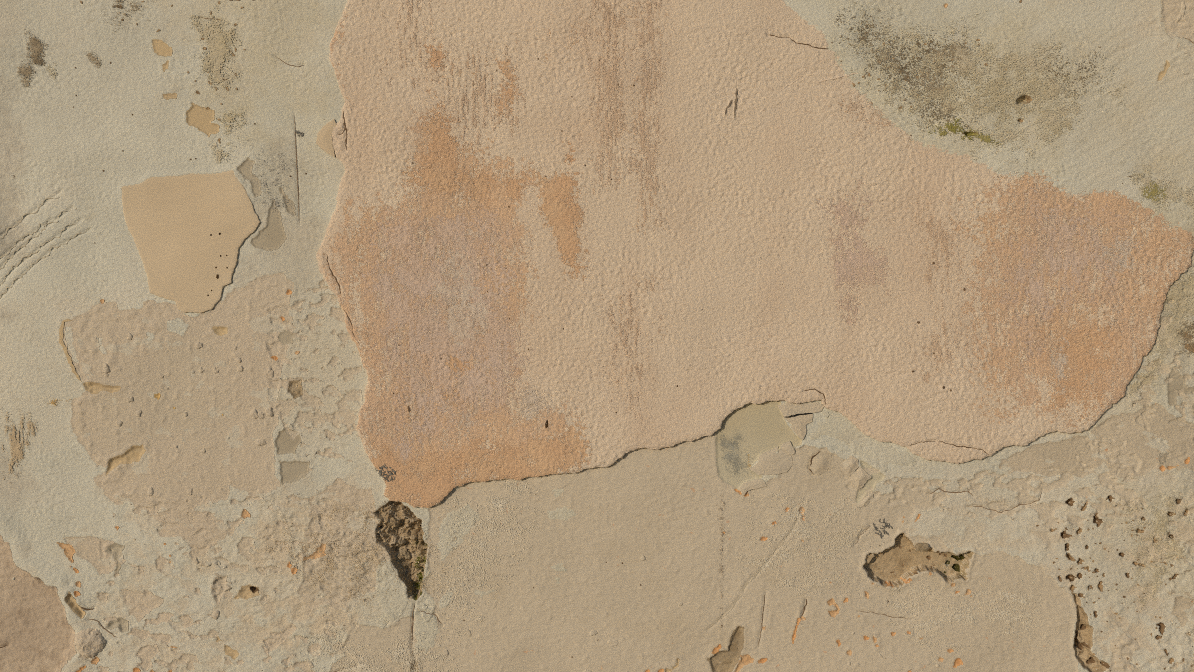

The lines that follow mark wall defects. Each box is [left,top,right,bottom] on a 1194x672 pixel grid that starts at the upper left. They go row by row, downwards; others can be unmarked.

peeling [0,406,42,483]
flaking render [0,535,243,672]
peeling [257,0,1194,672]
leakage [826,0,1194,433]